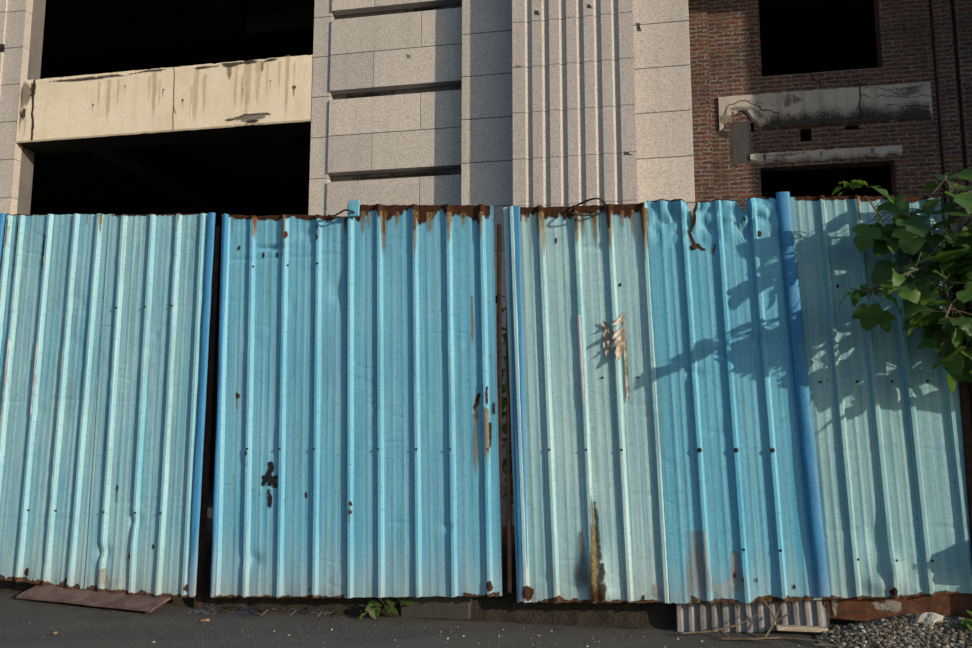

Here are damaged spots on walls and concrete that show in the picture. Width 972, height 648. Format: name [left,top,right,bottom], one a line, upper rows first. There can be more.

damp [54,69,166,82]
damp [193,58,277,78]
damp [20,83,30,120]
damp [765,87,931,128]
rust [228,204,491,258]
rust [520,199,735,257]
rust [691,584,970,616]